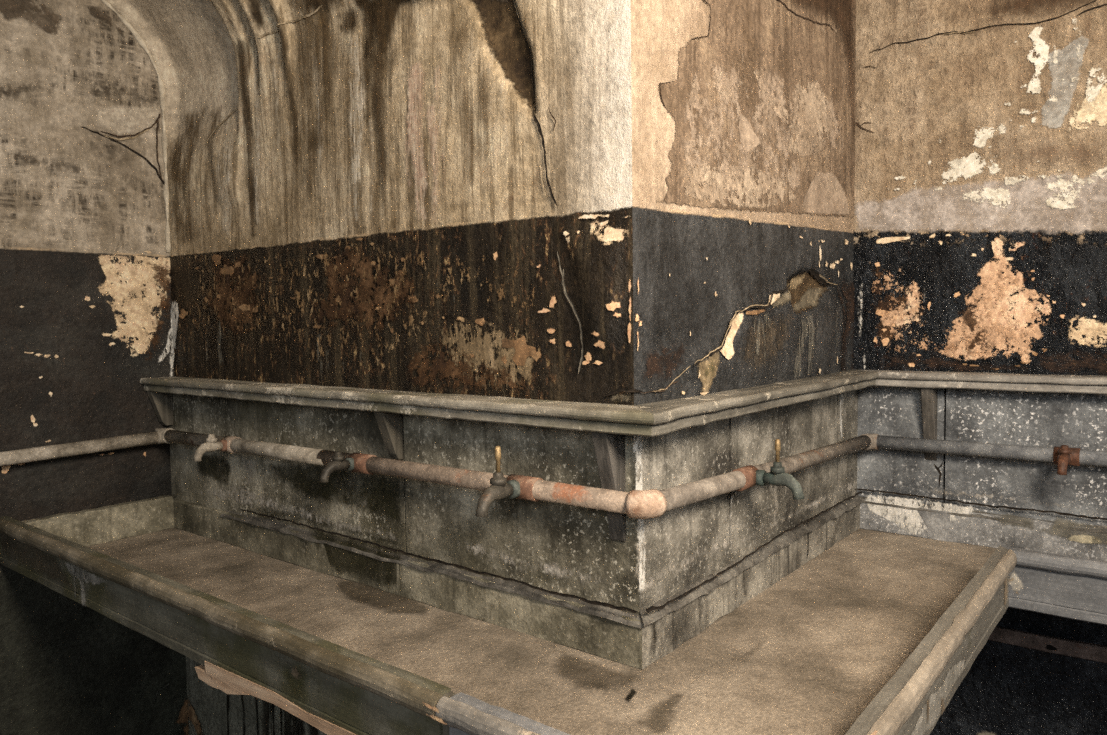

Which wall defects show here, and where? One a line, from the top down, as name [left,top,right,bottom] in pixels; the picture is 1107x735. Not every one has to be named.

crack [865,0,1107,68]
crack [80,114,165,185]
water stain [171,42,261,239]
water stain [274,0,404,220]
crack [533,107,557,206]
peeling [563,214,628,245]
peeling [659,0,1107,367]
peeling [84,251,188,359]
crack [603,269,837,401]
flaking render [698,236,853,395]
water stain [197,455,427,612]
water stain [637,519,652,591]